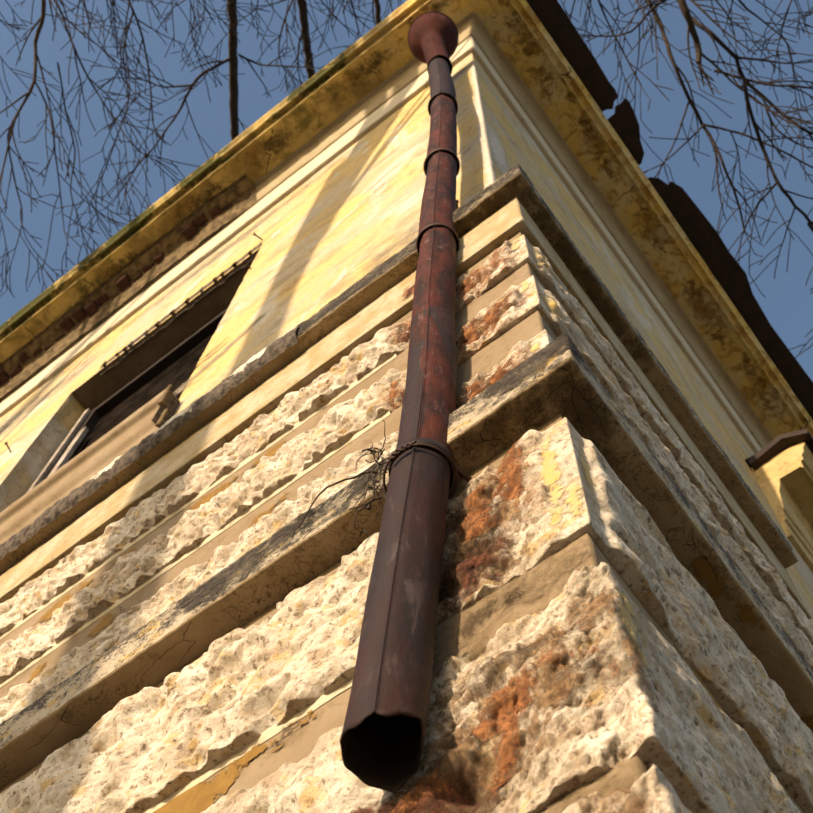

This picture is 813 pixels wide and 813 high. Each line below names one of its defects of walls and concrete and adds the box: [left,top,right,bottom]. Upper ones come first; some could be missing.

damp [526,66,615,178]
damp [2,356,93,431]
spalling [0,326,299,560]
damp [176,314,265,394]
damp [285,223,419,337]
corrosion [456,246,518,306]
corrosion [456,348,529,405]
corrosion [456,290,530,361]
damp [162,450,395,628]
corrosion [440,439,531,605]
crack [141,620,196,678]
corrosion [350,588,621,813]